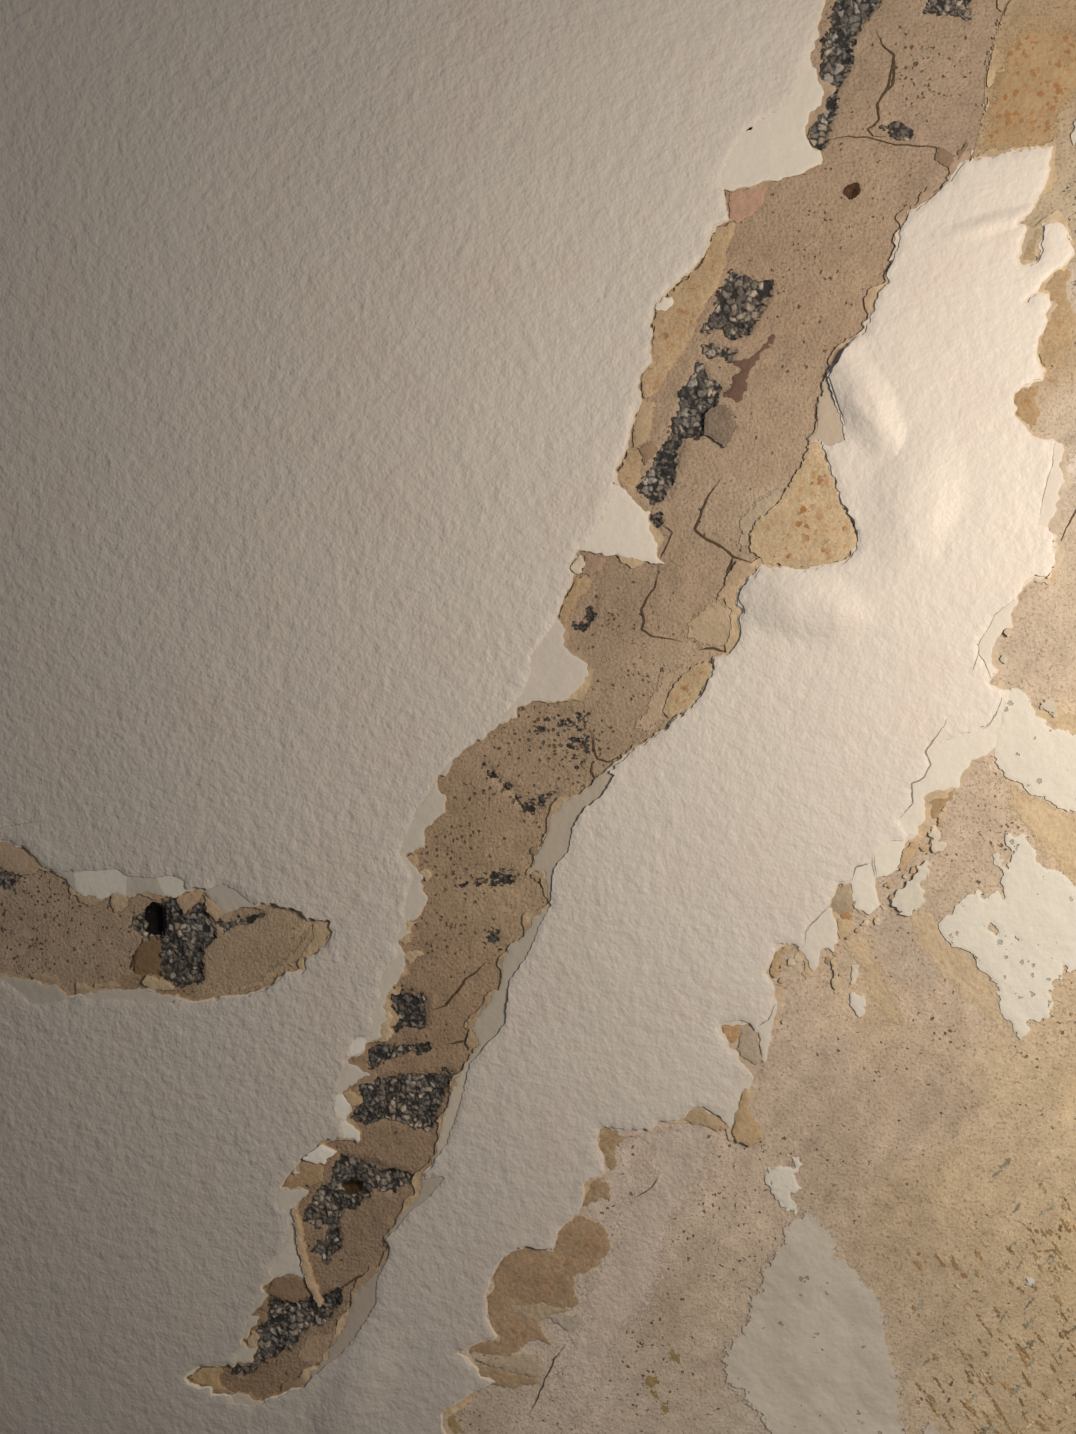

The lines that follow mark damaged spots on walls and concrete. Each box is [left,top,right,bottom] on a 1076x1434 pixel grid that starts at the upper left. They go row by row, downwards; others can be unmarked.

crack [827,29,938,149]
crack [641,479,751,652]
peeling [184,0,1009,1406]
peeling [0,839,333,1004]